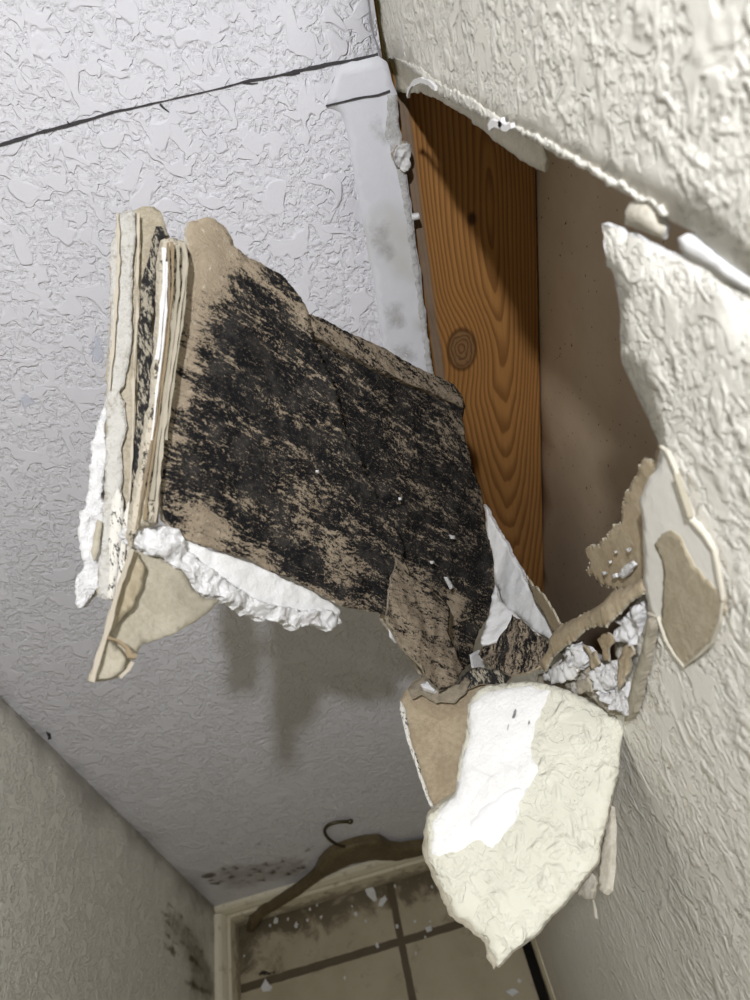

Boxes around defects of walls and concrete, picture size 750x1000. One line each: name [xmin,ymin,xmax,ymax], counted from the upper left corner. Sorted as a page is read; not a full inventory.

crack [0,0,390,147]
spalling [398,59,668,217]
spalling [385,94,434,374]
spalling [677,232,750,294]
spalling [117,525,342,632]
peeling [624,445,728,722]
water stain [459,667,512,690]
flaking render [431,685,550,857]
peeling [365,887,387,907]